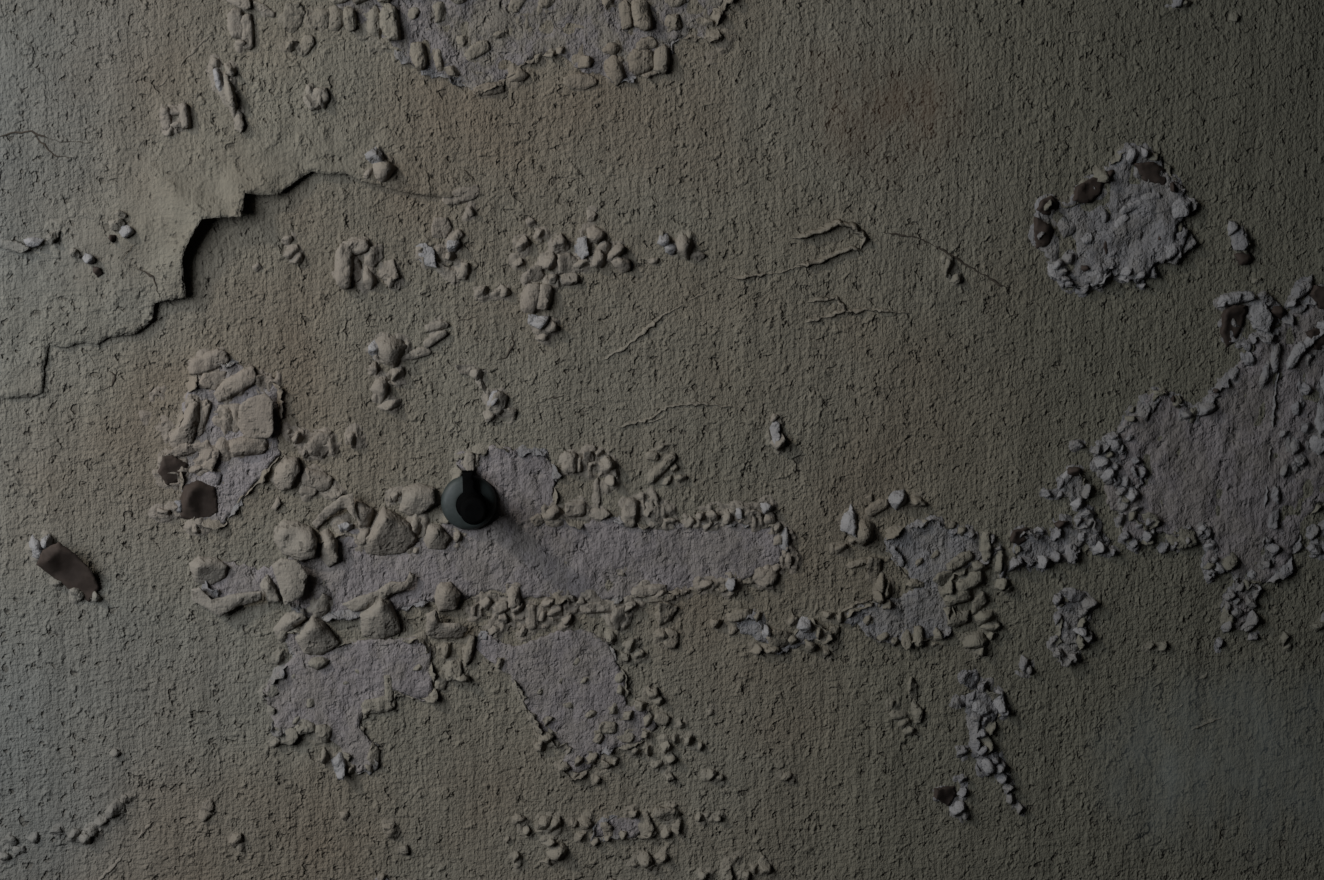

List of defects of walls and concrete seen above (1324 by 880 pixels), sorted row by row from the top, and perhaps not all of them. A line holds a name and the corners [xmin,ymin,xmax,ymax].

peeling [278,0,737,99]
flaking render [1028,142,1198,297]
peeling [706,221,1324,823]
peeling [257,593,705,786]
peeling [700,768,728,786]
peeling [228,832,249,852]
peeling [381,817,409,856]
peeling [504,801,726,876]
peeling [695,851,773,880]